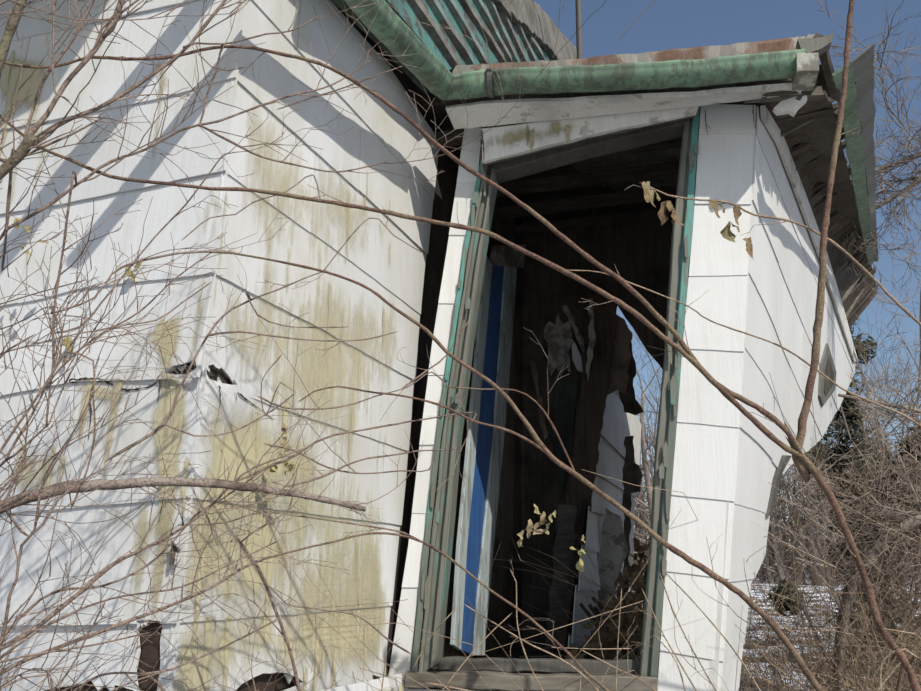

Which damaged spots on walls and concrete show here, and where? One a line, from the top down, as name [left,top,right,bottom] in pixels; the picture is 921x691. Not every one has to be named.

corrosion [661,46,703,61]
damp [161,318,183,435]
spalling [167,364,229,384]
damp [153,470,172,599]
damp [181,458,216,691]